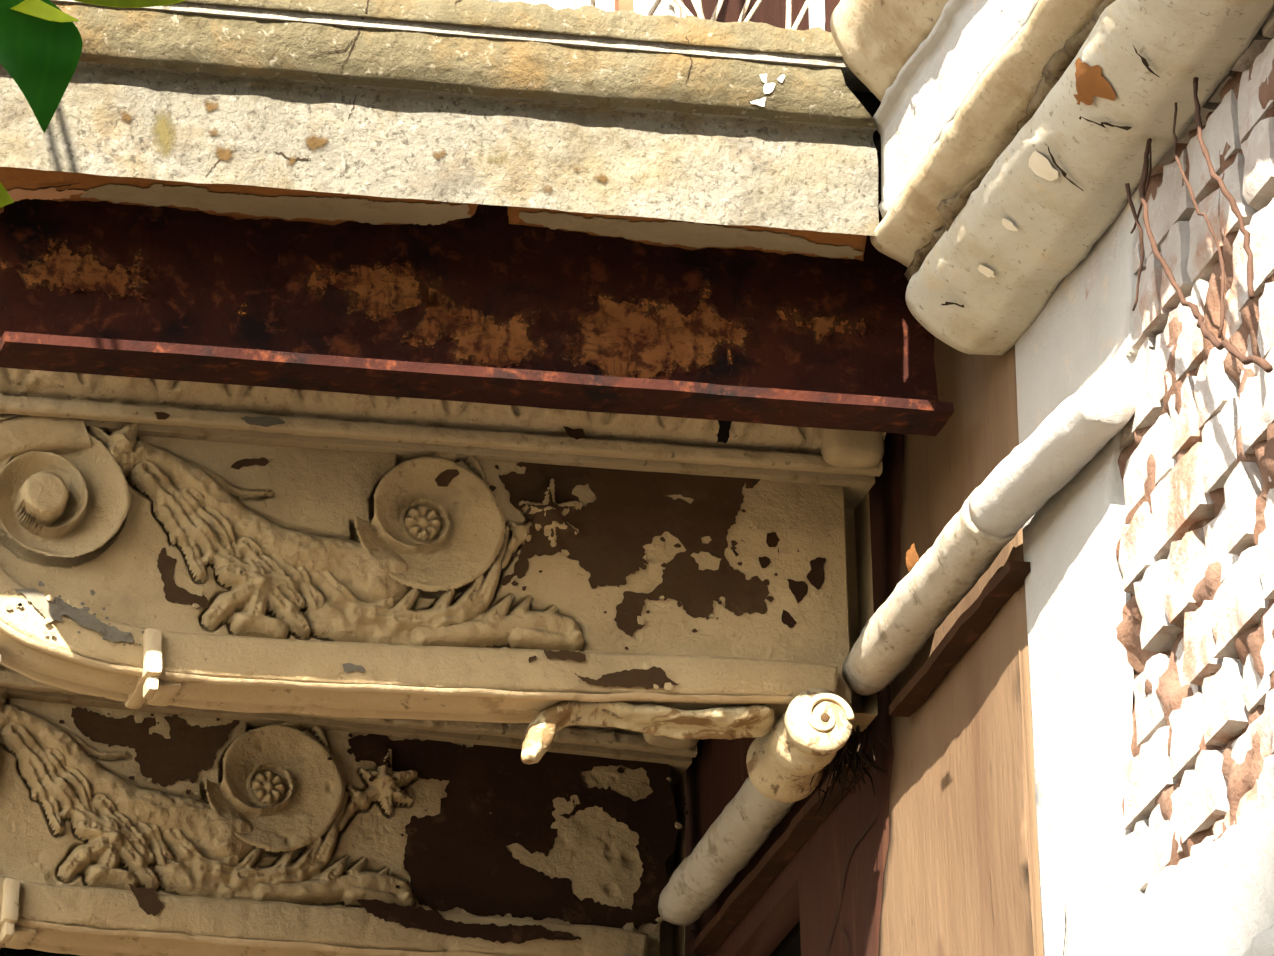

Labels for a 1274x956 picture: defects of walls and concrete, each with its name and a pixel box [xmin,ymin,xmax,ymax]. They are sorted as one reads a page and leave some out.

peeling [750,73,785,106]
flaking render [1073,58,1116,105]
flaking render [7,184,472,225]
corrosion [0,237,157,301]
corrosion [304,258,546,368]
corrosion [560,279,754,379]
corrosion [774,308,882,344]
peeling [157,548,210,608]
peeling [489,462,826,650]
peeling [528,650,679,691]
peeling [347,733,689,944]